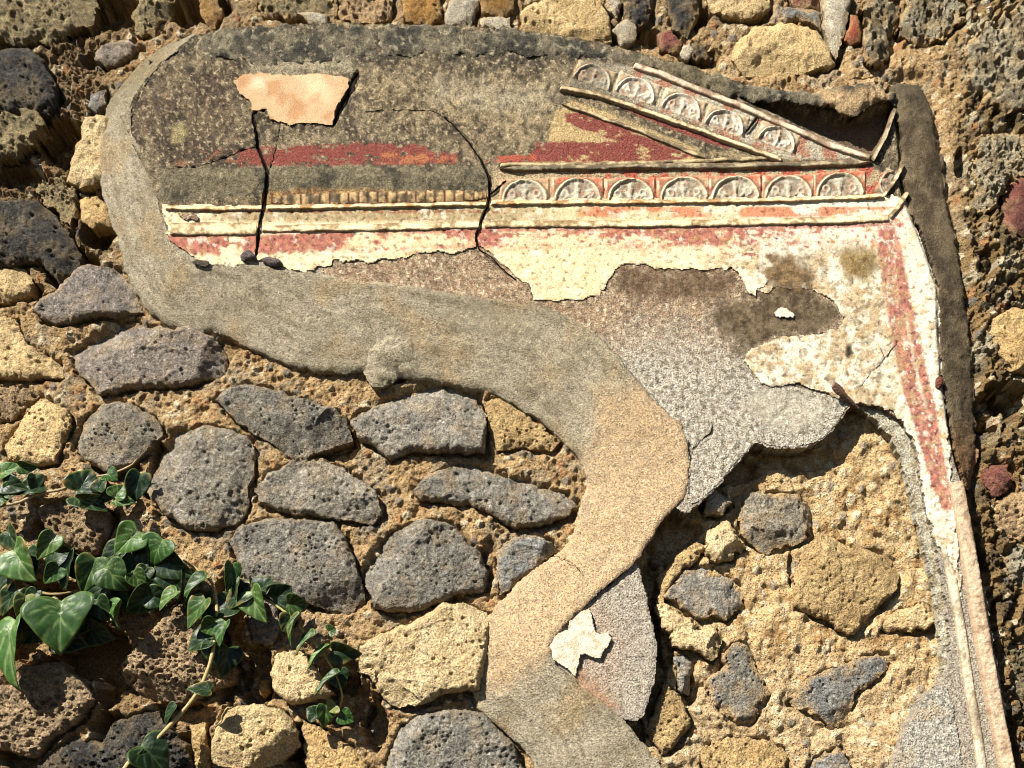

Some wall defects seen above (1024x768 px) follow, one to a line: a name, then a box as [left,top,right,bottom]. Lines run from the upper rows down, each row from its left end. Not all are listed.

crack [169,110,280,255]
crack [333,73,516,280]
water stain [715,253,838,354]
water stain [841,246,875,278]
spalling [321,246,963,768]